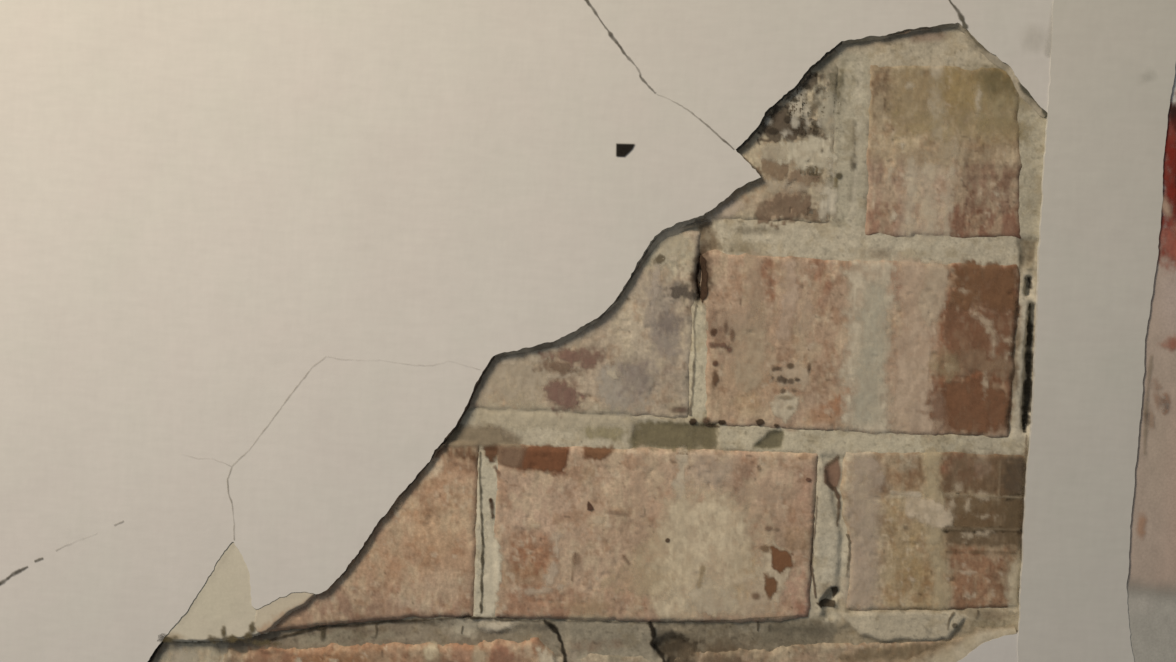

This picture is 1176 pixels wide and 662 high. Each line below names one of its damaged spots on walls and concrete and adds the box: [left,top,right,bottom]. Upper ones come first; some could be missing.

crack [585,0,653,90]
spalling [153,23,1046,662]
crack [0,558,43,585]
crack [269,452,567,662]
crack [343,356,495,576]